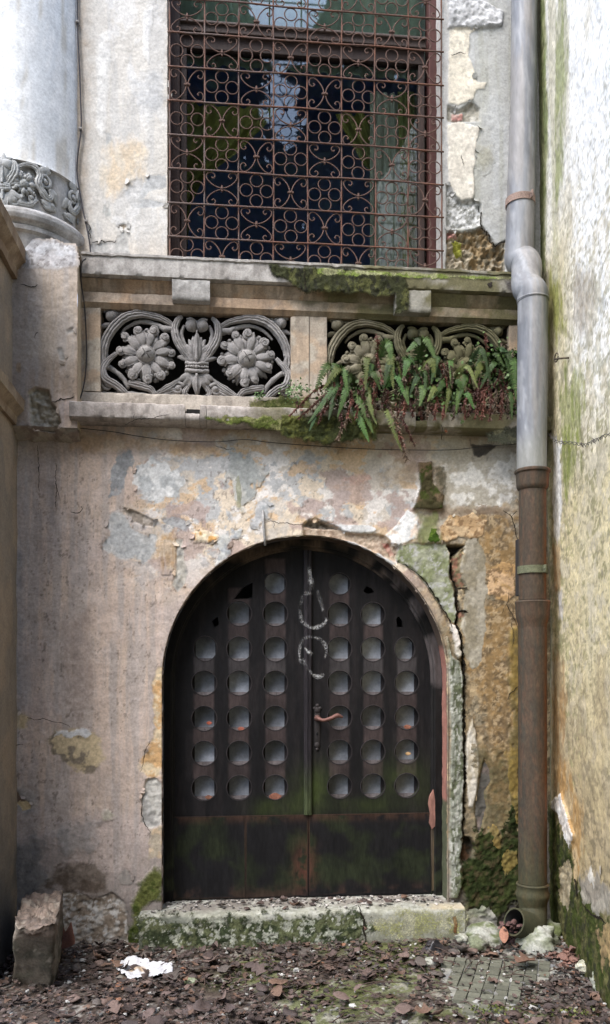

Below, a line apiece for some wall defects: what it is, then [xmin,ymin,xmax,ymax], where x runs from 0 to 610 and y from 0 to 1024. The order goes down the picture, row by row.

peeling [445,24,505,288]
water stain [568,251,597,356]
peeling [100,442,274,592]
spalling [302,516,406,564]
peeling [439,509,487,659]
peeling [485,562,515,602]
crack [398,558,468,838]
peeling [136,665,163,861]
spalling [460,759,490,861]
spalling [551,793,573,911]
peeling [588,860,602,889]